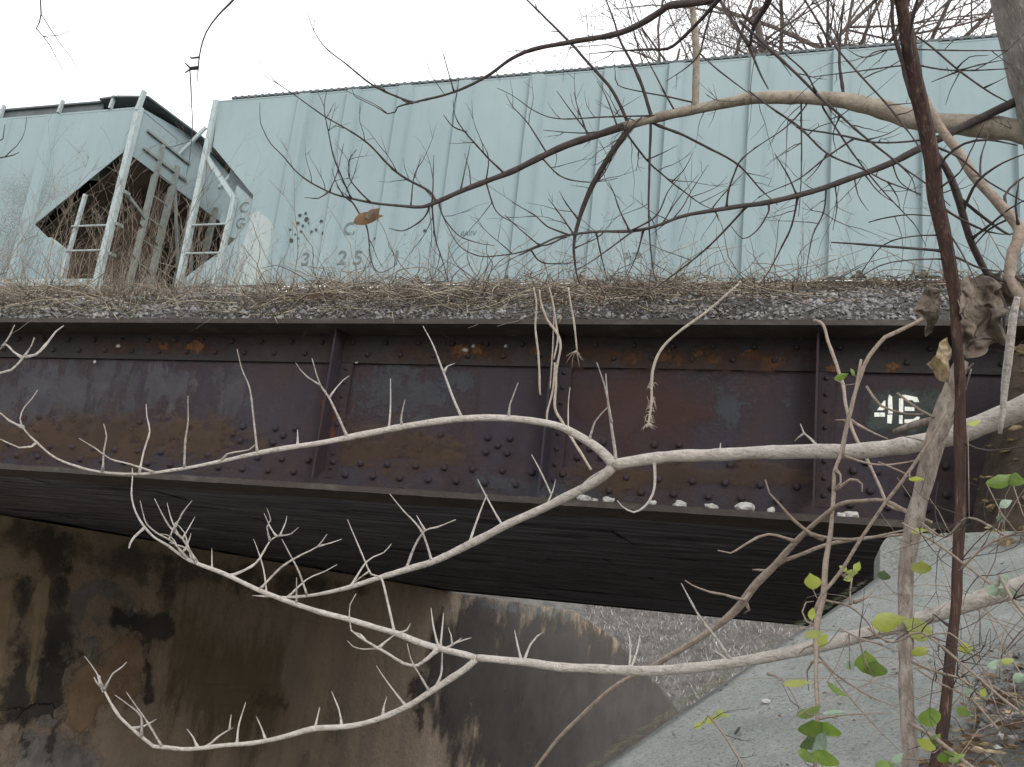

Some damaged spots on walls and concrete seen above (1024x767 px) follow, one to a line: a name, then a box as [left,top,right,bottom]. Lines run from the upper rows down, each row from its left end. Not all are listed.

rust [577,352,708,447]
damp [218,565,262,588]
damp [277,573,326,595]
damp [0,520,205,761]
damp [407,594,679,767]